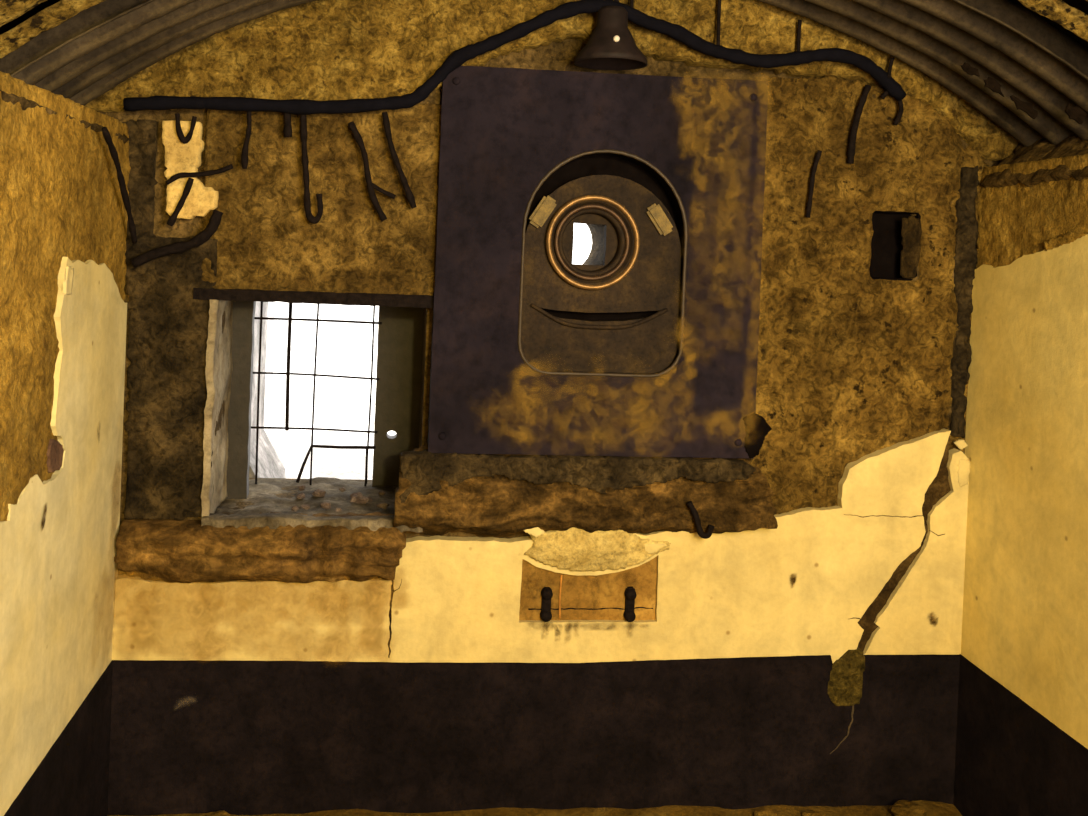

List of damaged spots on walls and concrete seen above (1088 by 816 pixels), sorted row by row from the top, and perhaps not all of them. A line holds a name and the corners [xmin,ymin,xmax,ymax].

spalling [0,71,441,521]
spalling [393,74,1088,539]
crack [844,166,979,651]